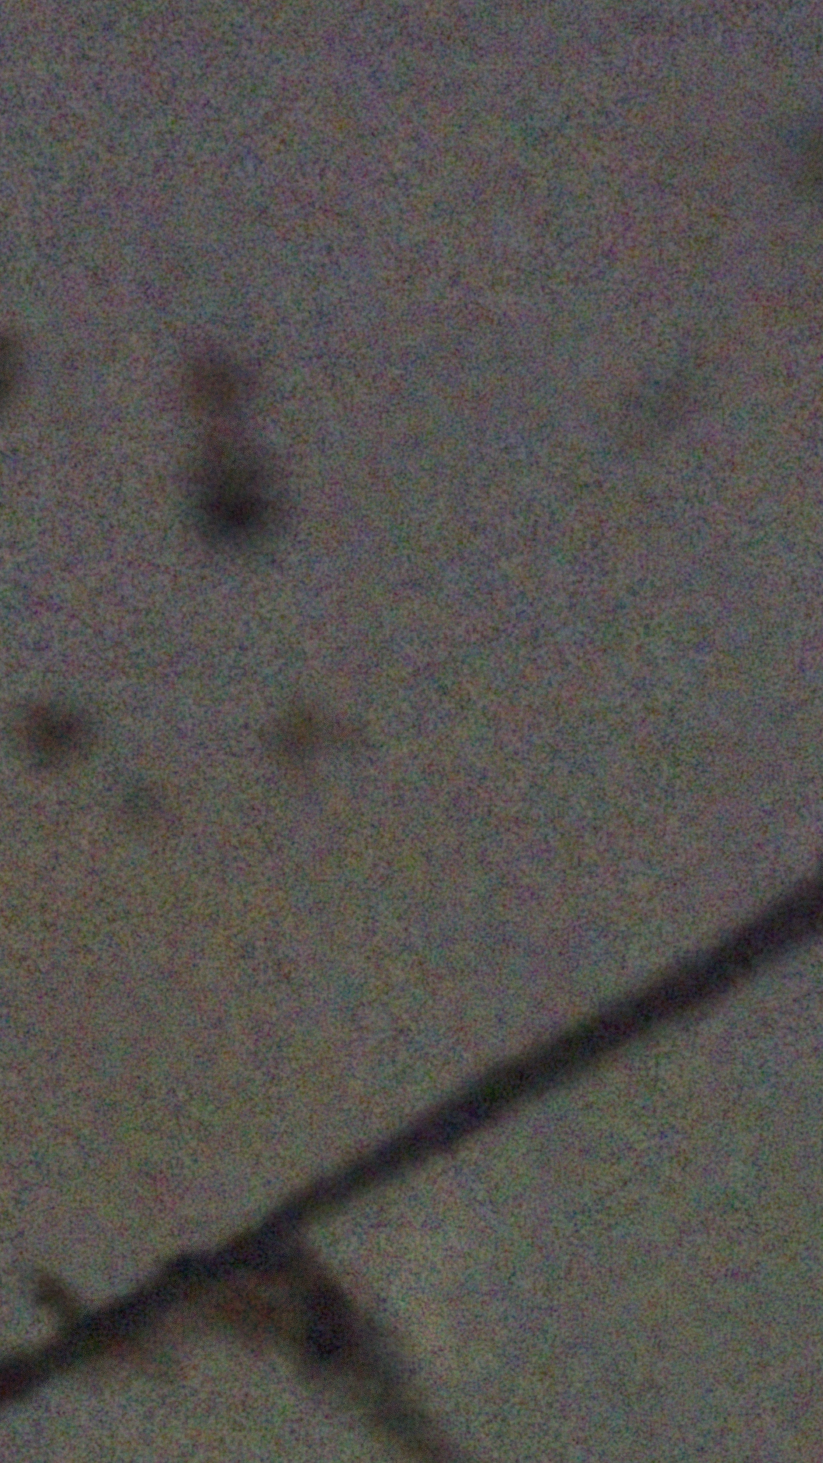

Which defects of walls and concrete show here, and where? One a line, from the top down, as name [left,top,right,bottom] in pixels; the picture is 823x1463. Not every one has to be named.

crack [0,878,823,1451]